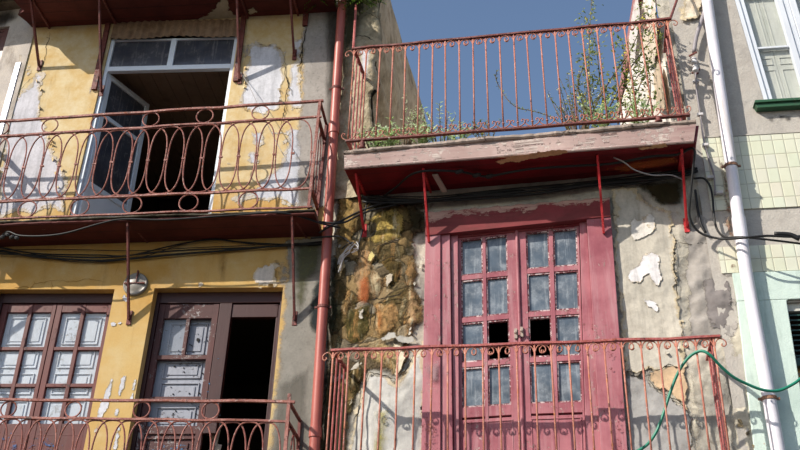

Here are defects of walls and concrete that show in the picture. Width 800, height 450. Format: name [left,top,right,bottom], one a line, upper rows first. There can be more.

peeling [239,38,303,114]
peeling [0,54,68,218]
peeling [231,128,301,207]
peeling [497,150,568,164]
water stain [400,203,424,254]
water stain [296,245,319,331]
water stain [326,258,339,350]
flaking render [328,197,425,450]
flaking render [665,215,738,354]
water stain [276,375,304,450]
water stain [320,364,345,450]
flaking render [611,366,692,450]